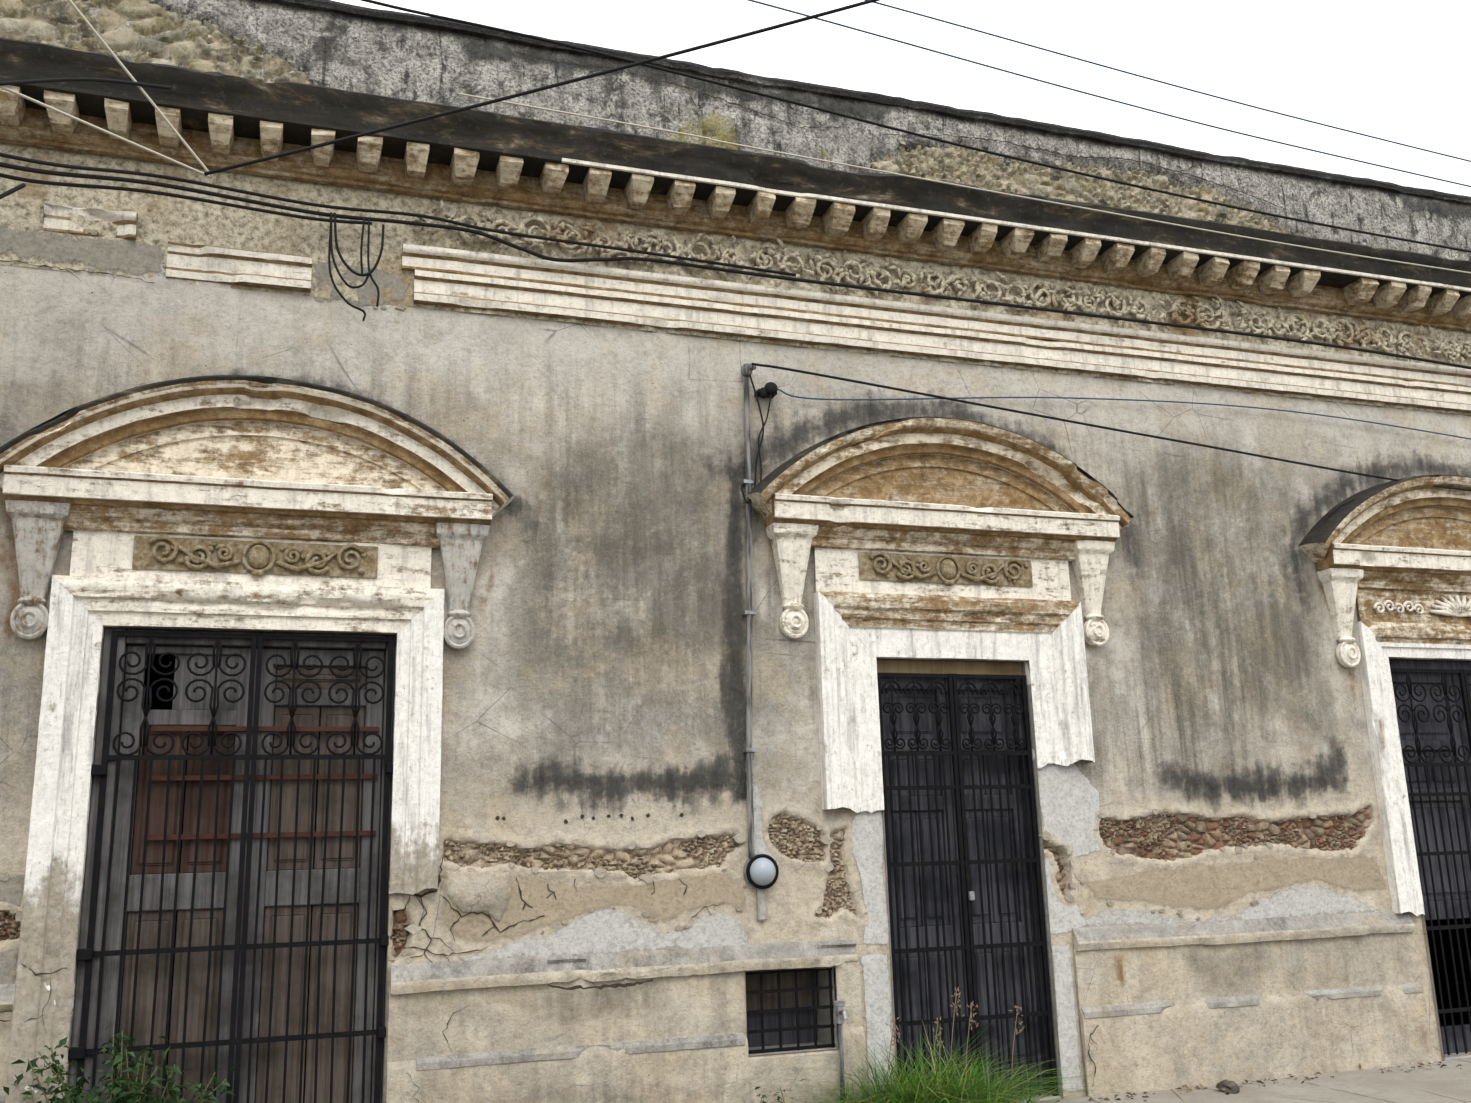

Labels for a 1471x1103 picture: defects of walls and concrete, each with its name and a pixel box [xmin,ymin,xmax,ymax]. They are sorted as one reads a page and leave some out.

damp [513,396,1076,810]
peeling [0,857,80,1103]
crack [397,857,577,962]
peeling [386,785,896,1099]
flaking render [1037,763,1385,1092]
damp [1162,743,1346,805]